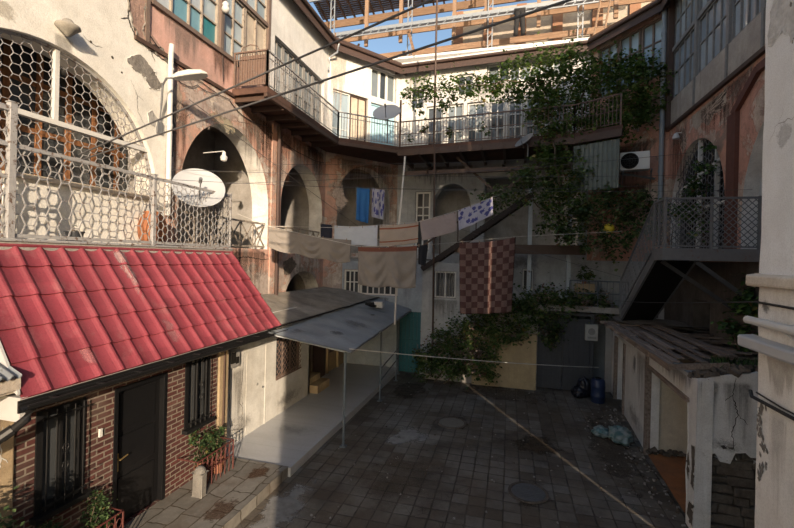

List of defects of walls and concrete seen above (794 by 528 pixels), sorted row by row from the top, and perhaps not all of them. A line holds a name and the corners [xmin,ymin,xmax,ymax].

flaking render [126,0,168,90]
flaking render [767,0,794,47]
crack [725,380,748,451]
flaking render [686,403,768,528]